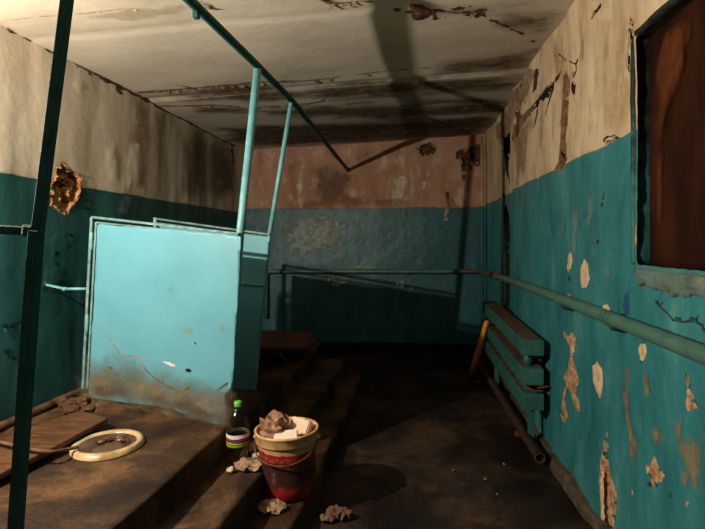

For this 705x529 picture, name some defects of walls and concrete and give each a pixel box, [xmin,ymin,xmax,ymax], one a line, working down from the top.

damp [182,86,300,112]
damp [227,56,524,145]
spalling [496,68,576,173]
spalling [456,143,486,182]
spalling [50,161,82,216]
peeling [580,259,590,288]
crack [653,298,705,334]
peeling [560,332,580,423]
peeling [592,361,603,398]
peeling [686,374,699,412]
spalling [599,431,617,529]
peeling [645,456,665,488]